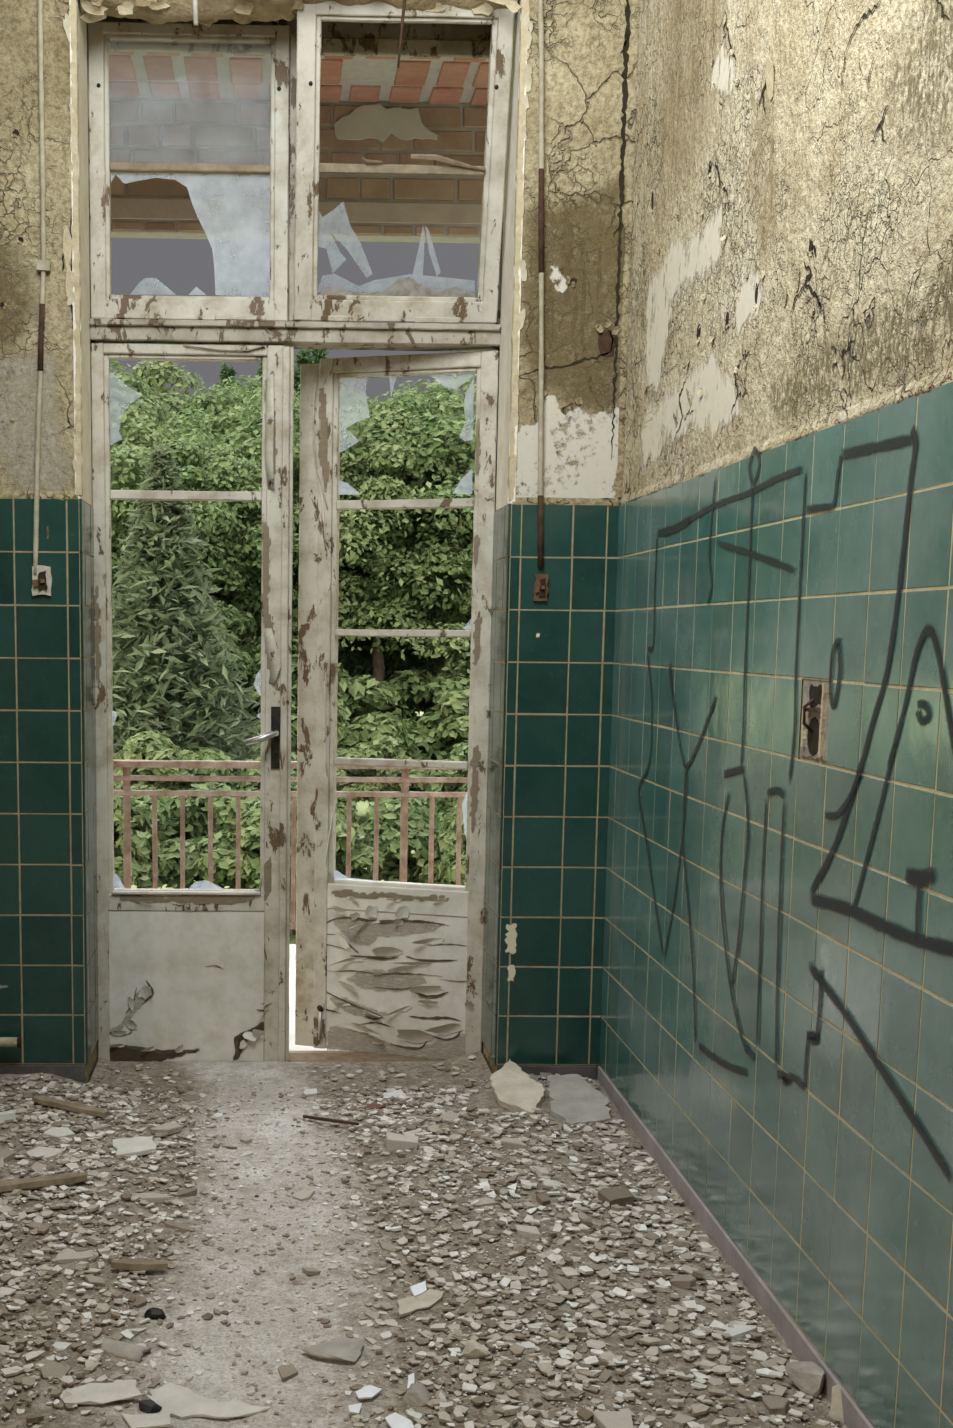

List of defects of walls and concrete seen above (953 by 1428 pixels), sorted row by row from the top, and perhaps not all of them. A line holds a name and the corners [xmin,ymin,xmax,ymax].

crack [841,0,888,143]
crack [933,0,950,22]
peeling [0,0,621,500]
crack [519,0,631,460]
peeling [641,161,765,478]
crack [780,245,860,379]
peeling [97,980,200,1062]
peeling [233,1003,272,1060]
peeling [312,889,474,1060]